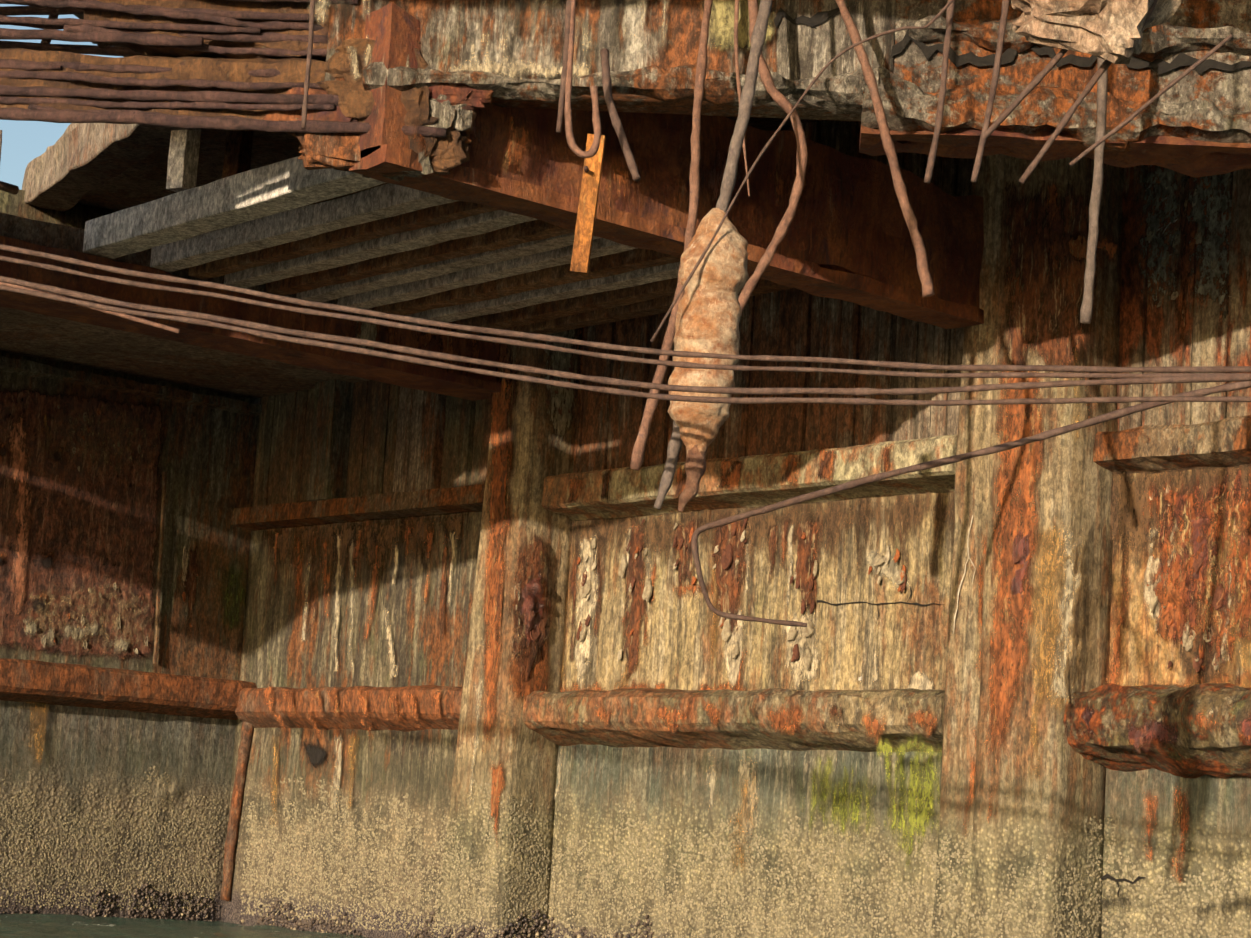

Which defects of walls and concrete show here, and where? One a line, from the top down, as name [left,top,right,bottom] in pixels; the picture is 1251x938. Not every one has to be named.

spalling [0,0,1251,182]
rust [701,143,742,204]
rust [766,154,816,214]
crack [774,7,840,29]
crack [891,29,1251,74]
rust [9,411,33,618]
rust [261,511,469,678]
rust [470,343,519,802]
crack [817,515,976,633]
rust [963,180,1118,834]
rust [1105,464,1251,684]
crack [1101,874,1146,896]